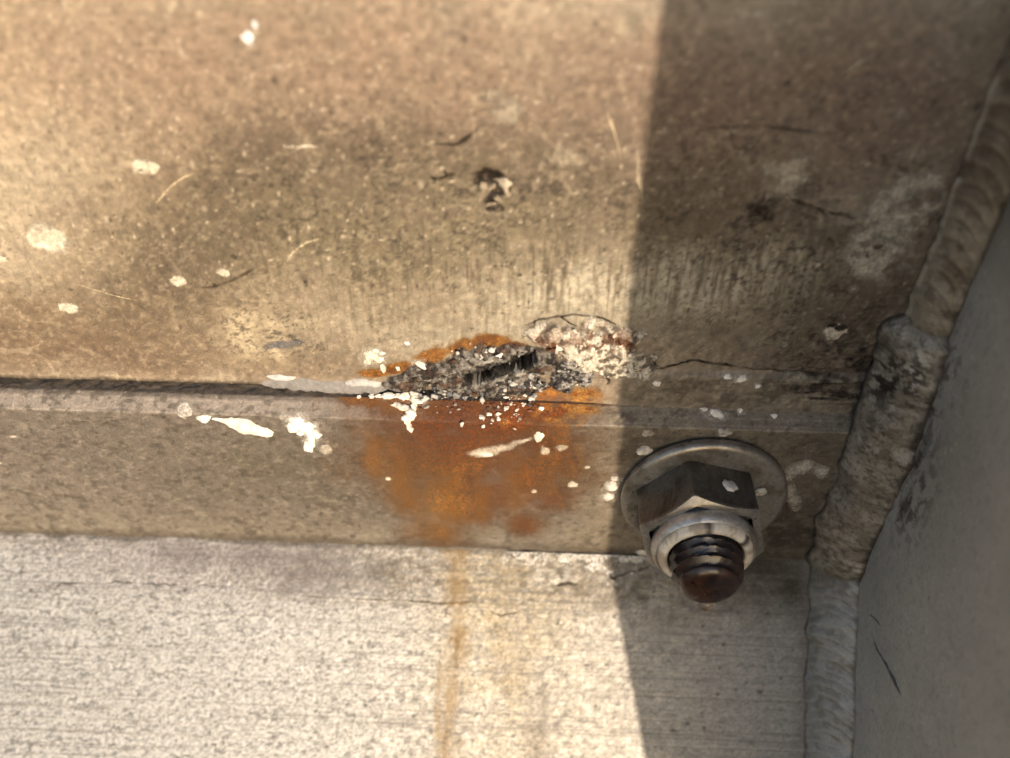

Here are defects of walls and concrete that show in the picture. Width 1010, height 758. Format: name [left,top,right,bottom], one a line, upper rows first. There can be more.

crack [522,314,625,338]
peeling [363,349,400,373]
corrosion [342,318,658,556]